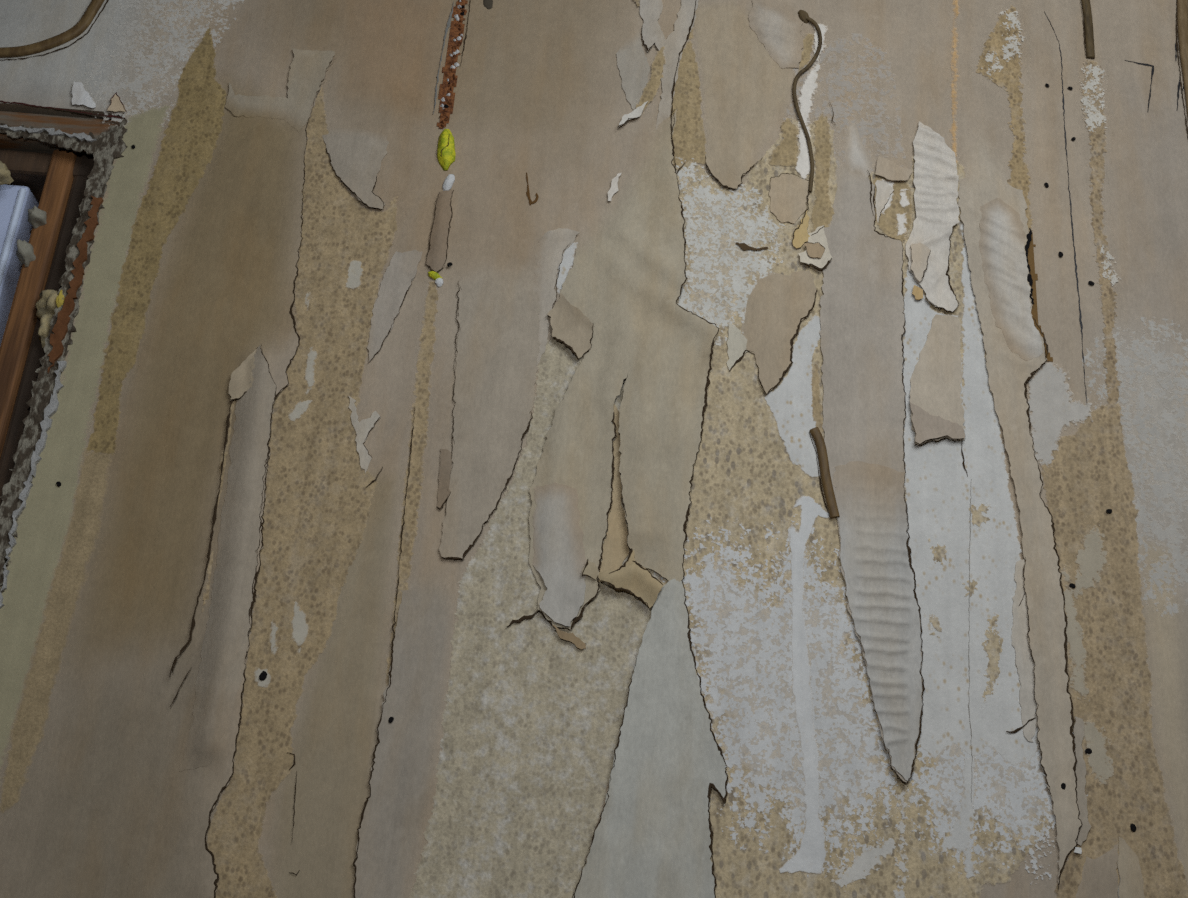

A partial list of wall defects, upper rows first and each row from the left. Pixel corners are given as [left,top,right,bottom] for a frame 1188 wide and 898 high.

flaking render [676,157,785,346]
flaking render [1026,362,1093,465]
flaking render [682,224,1060,898]
crack [287,752,297,839]